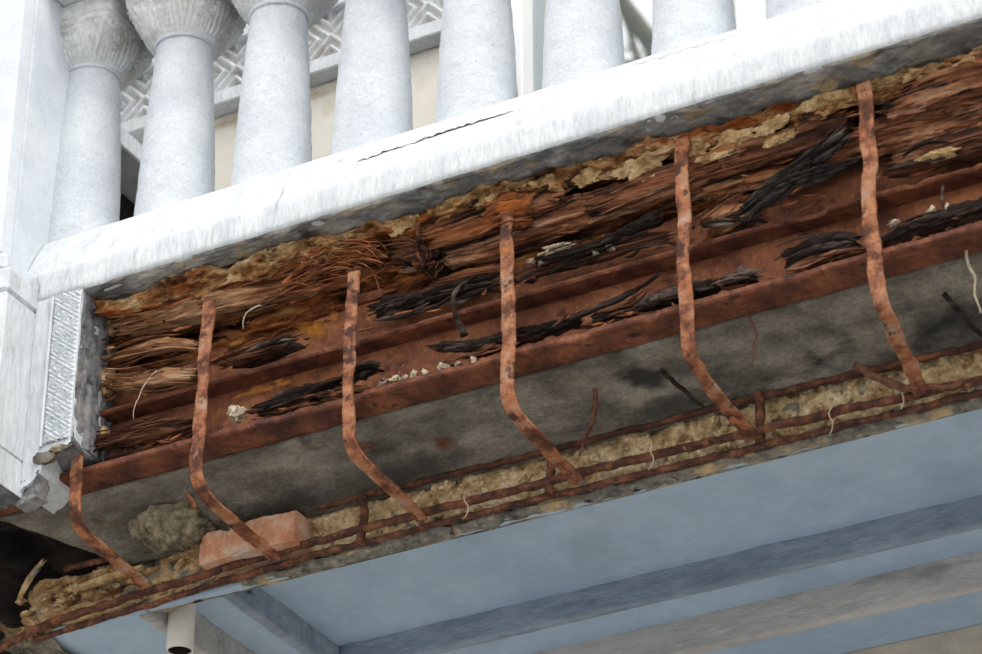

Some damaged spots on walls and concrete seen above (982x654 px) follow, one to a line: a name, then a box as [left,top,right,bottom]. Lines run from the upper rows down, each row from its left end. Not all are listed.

spalling [871,45,982,104]
crack [357,111,512,162]
spalling [0,87,859,514]
spalling [235,349,982,594]
spalling [0,545,223,654]